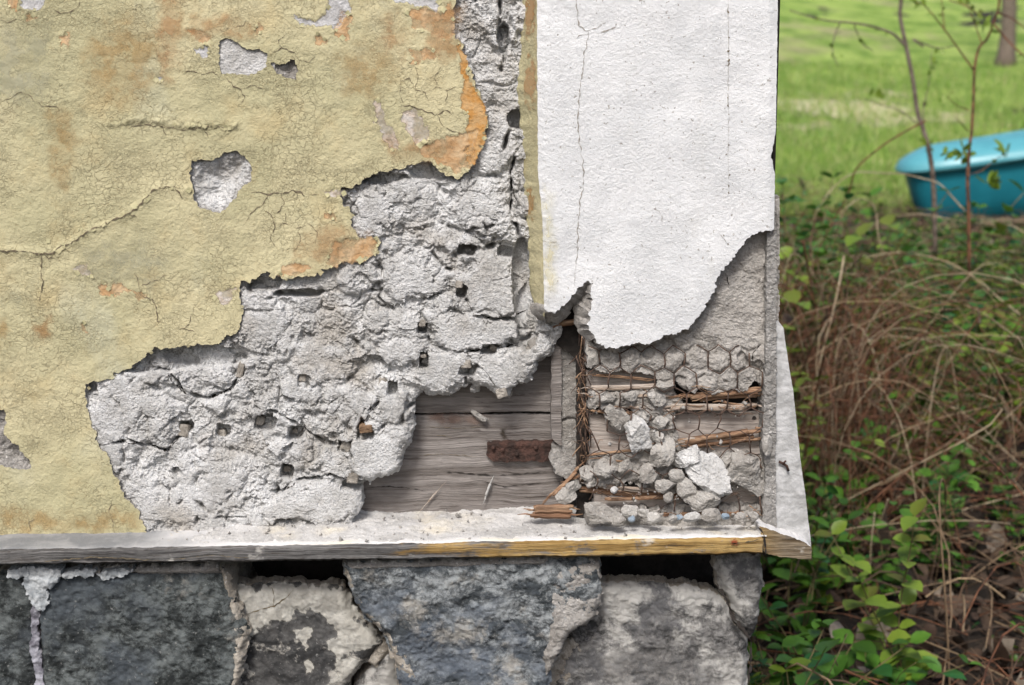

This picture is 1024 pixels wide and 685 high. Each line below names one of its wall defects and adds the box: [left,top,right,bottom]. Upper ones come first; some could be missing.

crack [0,186,192,299]
flaking render [87,0,563,532]
crack [399,67,463,135]
crack [544,3,615,281]
flaking render [584,194,780,395]
flaking render [0,410,31,469]